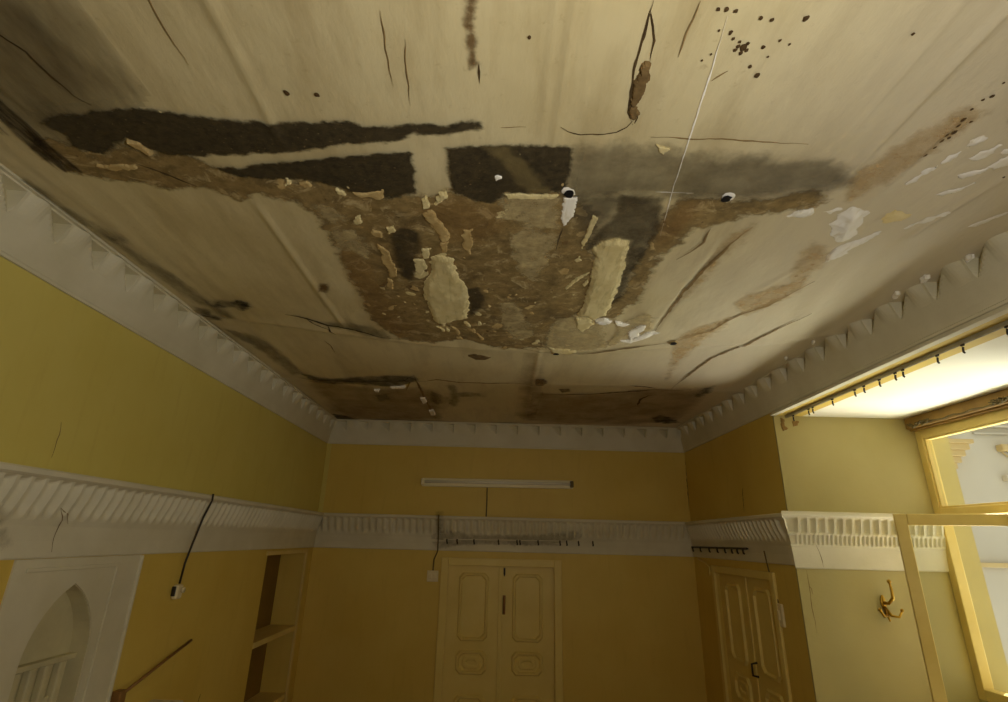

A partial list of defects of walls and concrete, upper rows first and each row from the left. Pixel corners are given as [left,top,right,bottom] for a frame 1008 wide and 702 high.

crack [563,1,656,135]
crack [678,1,701,57]
water stain [718,29,750,56]
water stain [0,100,81,173]
flaking render [905,135,1008,196]
water stain [923,95,995,157]
spalling [32,137,843,360]
flaking render [825,209,951,263]
crack [587,227,815,390]
water stain [302,374,417,386]
crack [383,377,651,419]